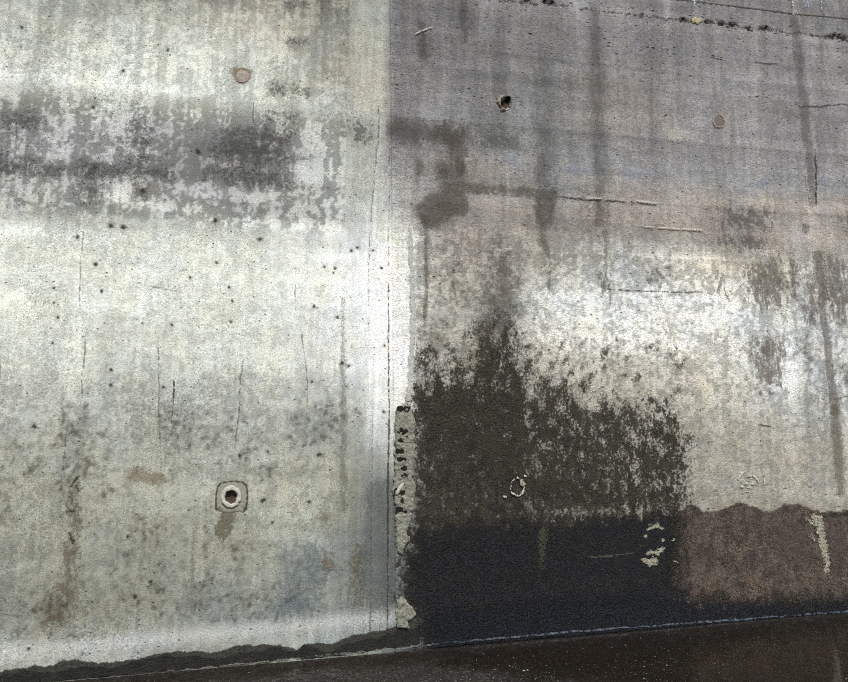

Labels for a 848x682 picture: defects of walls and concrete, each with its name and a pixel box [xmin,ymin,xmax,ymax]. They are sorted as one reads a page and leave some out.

damp [418,182,558,226]
damp [0,308,848,682]